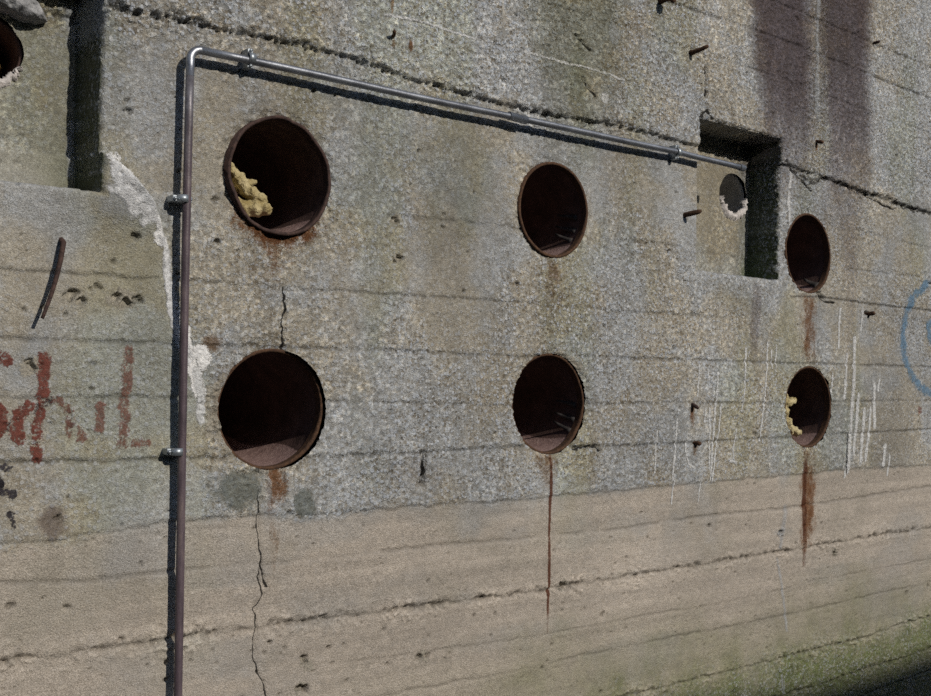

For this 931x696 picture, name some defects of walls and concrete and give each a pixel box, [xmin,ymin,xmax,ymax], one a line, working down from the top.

crack [786,158,931,215]
crack [252,489,268,696]
rust [545,455,553,615]